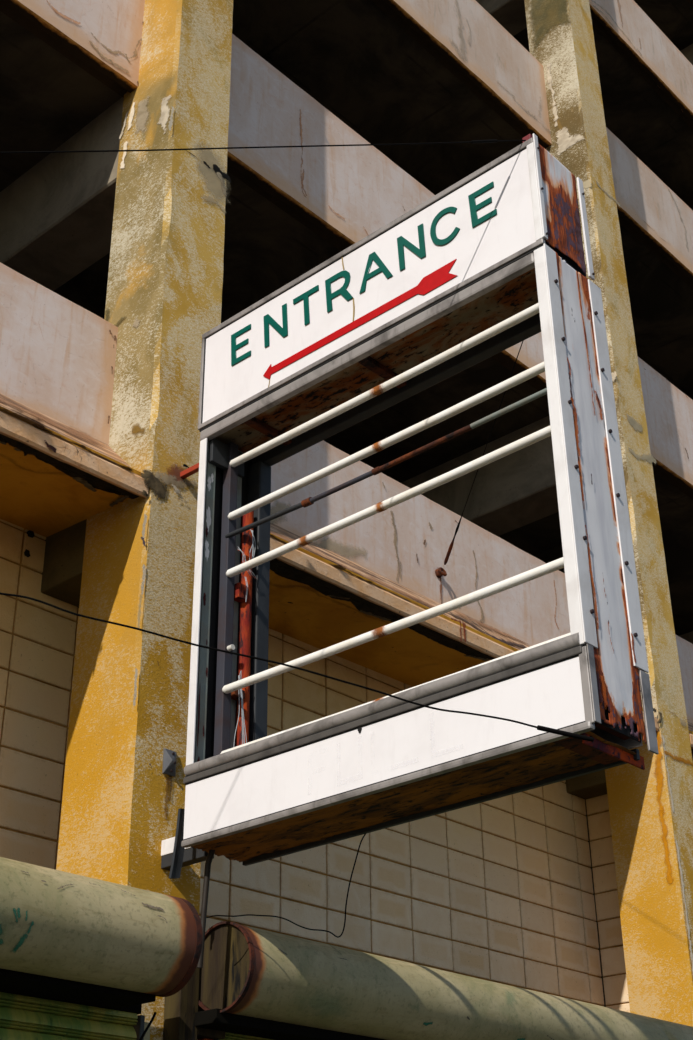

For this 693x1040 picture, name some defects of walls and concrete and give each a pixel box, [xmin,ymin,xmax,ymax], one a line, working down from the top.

water stain [531,0,569,46]
peeling [119,95,174,168]
water stain [198,145,225,213]
rust [577,276,603,420]
water stain [0,396,132,471]
rust [567,358,593,501]
peeling [0,434,197,507]
crack [391,511,401,582]
rust [585,525,614,652]
rust [596,673,608,706]